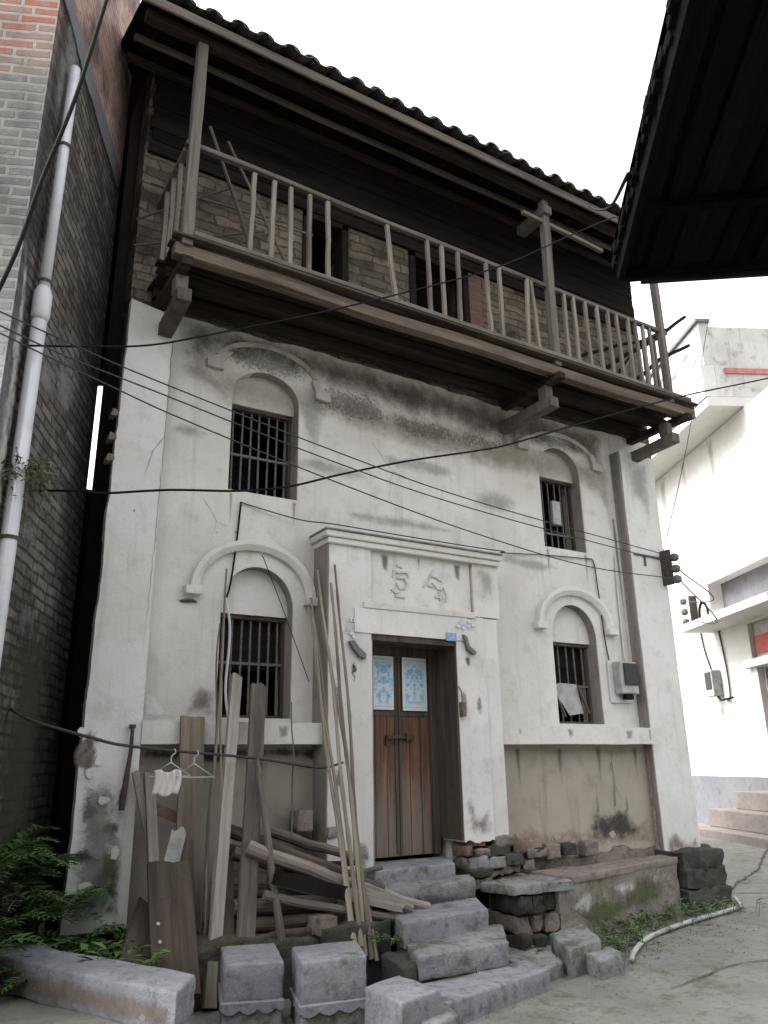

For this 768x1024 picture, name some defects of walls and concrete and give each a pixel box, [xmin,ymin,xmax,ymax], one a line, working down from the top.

peeling [74,727,122,912]
leakage [593,804,636,838]